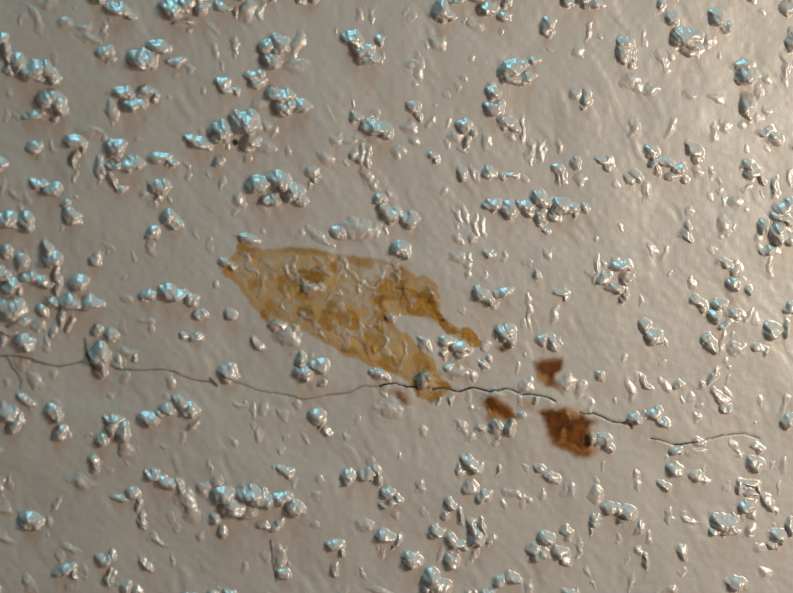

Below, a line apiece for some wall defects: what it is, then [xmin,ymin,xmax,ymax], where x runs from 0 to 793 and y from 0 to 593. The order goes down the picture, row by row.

damp [223,242,481,402]
rust [538,361,561,385]
crack [379,383,556,402]
rust [485,398,513,420]
crack [579,412,633,429]
rust [540,409,592,457]
crack [650,433,759,445]